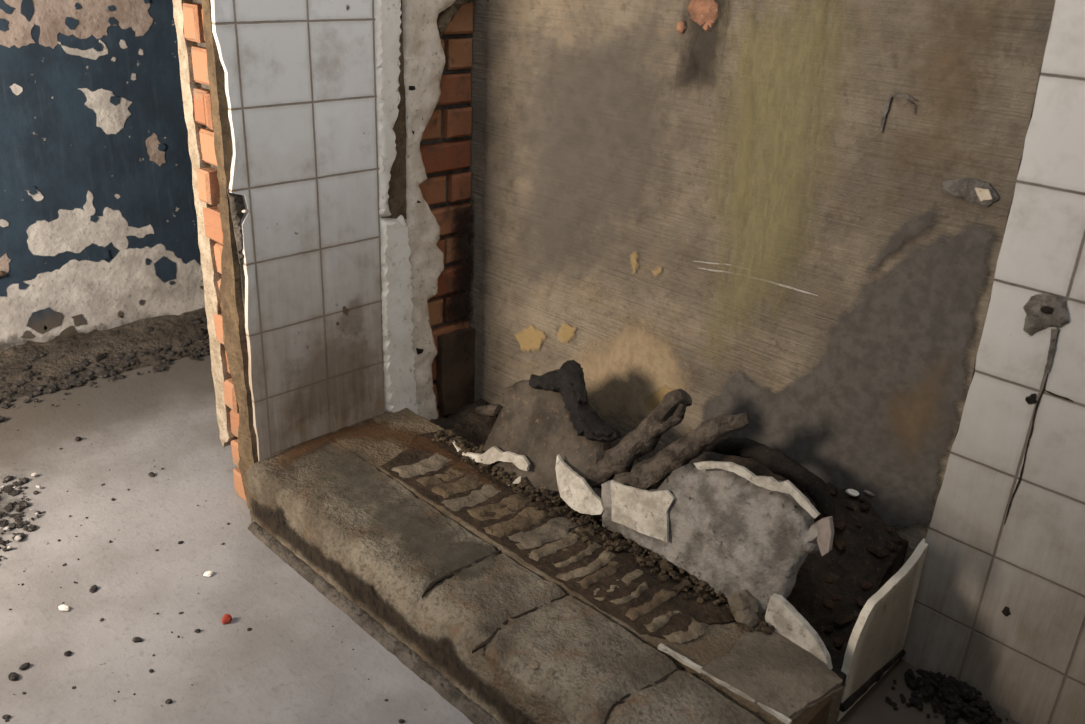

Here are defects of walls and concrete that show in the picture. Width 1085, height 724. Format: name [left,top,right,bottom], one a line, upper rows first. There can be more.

peeling [0,0,153,62]
spalling [677,0,719,34]
water stain [675,0,727,85]
peeling [77,88,132,134]
peeling [146,133,166,166]
peeling [26,186,44,201]
peeling [402,0,456,421]
spalling [941,178,999,208]
peeling [0,190,205,352]
crack [422,550,501,598]
crack [604,667,684,724]